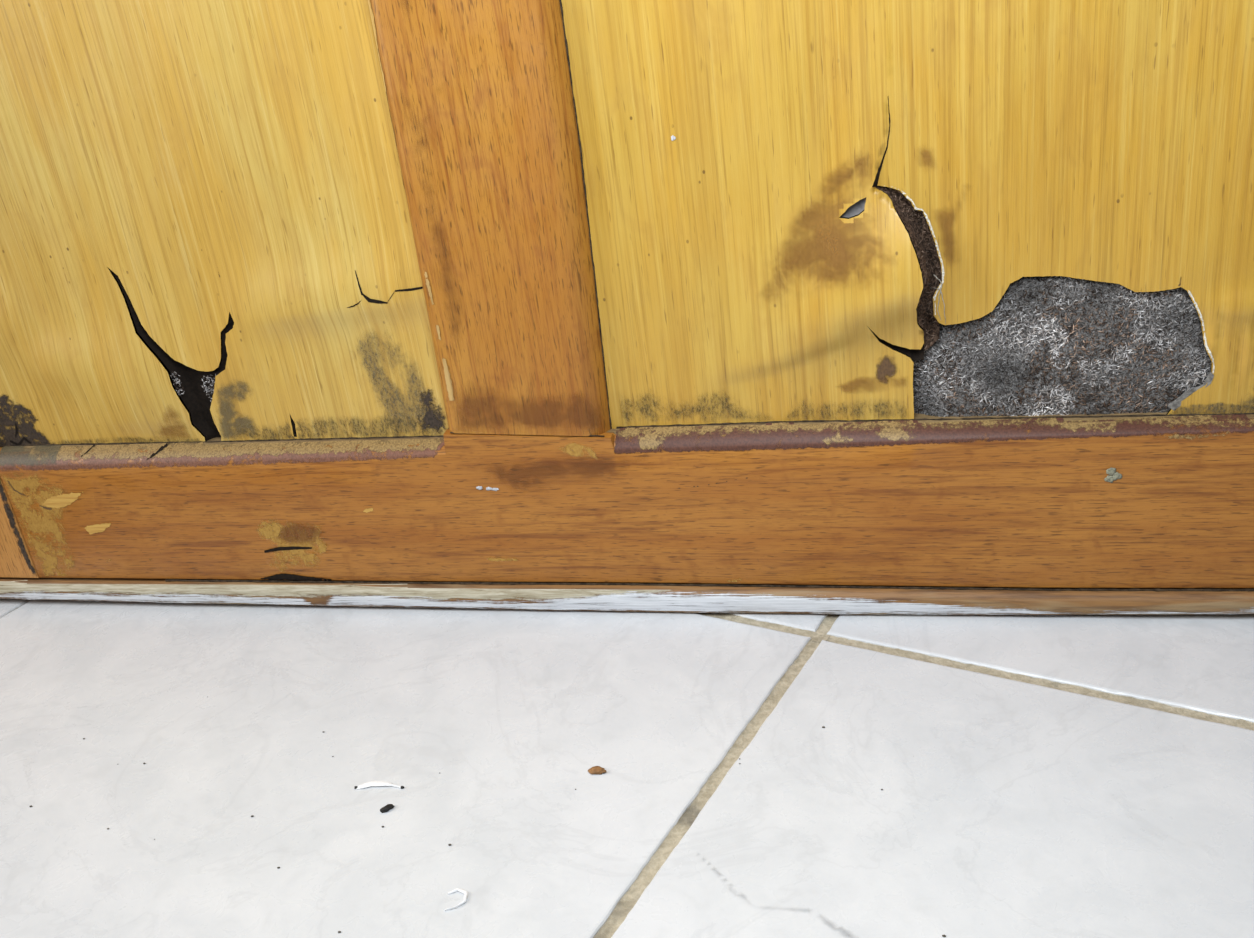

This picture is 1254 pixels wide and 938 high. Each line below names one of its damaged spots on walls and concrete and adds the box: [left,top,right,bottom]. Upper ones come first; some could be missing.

crack [872,98,890,187]
crack [347,270,423,308]
crack [112,271,234,441]
leakage [219,340,445,440]
crack [875,334,924,362]
spalling [913,276,1215,417]
crack [148,443,168,459]